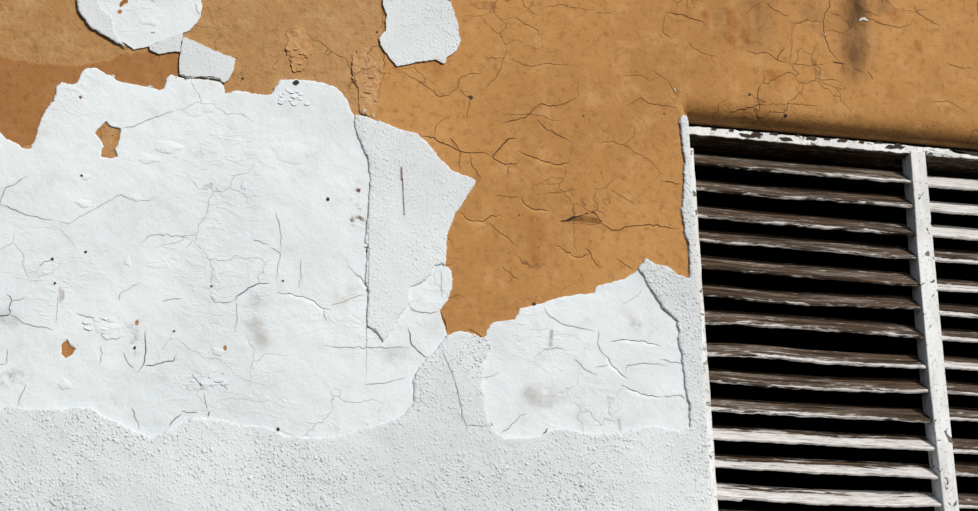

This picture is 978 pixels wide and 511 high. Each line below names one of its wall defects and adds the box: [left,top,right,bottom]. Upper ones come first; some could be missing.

crack [748,0,939,77]
crack [0,178,152,224]
peeling [0,0,978,337]
crack [405,57,578,246]
crack [601,190,676,231]
crack [554,245,632,269]
peeling [61,340,75,358]
crack [0,294,229,425]
crack [211,214,525,433]
crack [543,308,686,400]